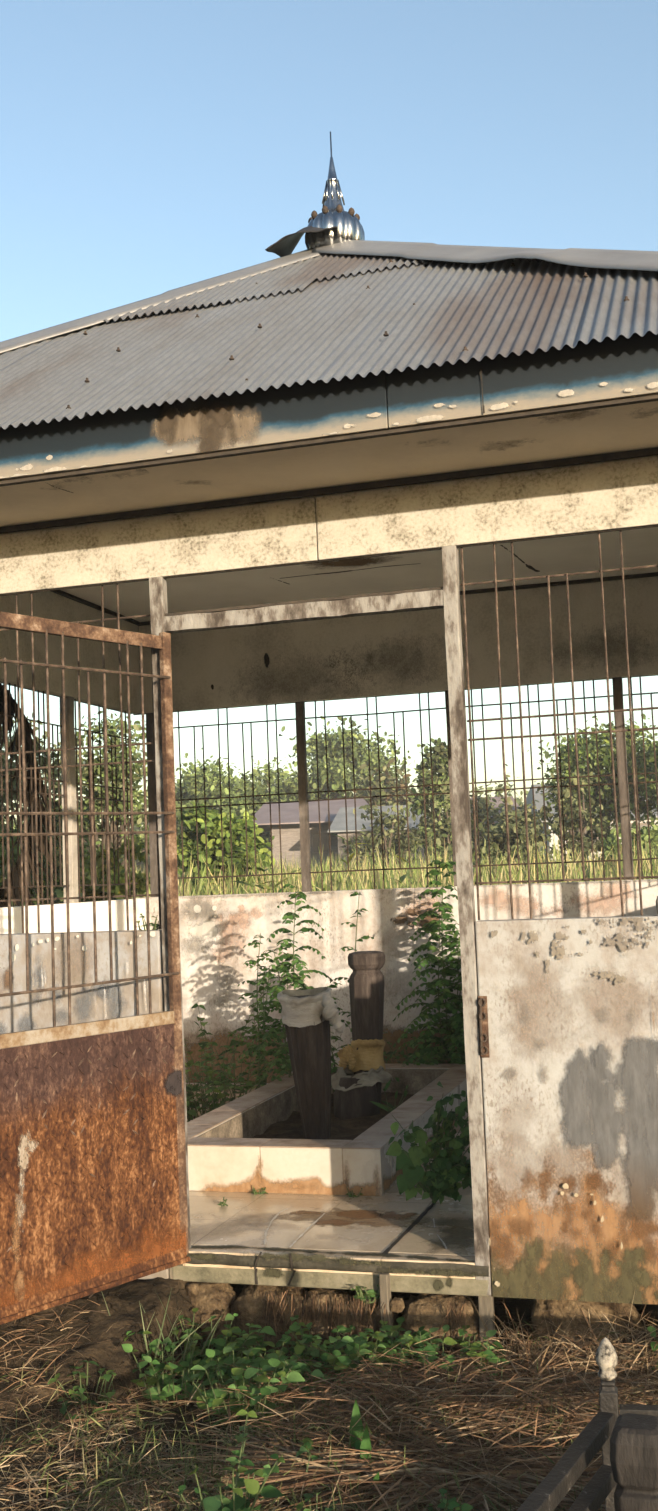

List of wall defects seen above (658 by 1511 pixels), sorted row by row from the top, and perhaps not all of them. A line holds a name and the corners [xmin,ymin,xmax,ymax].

water stain [154,400,258,452]